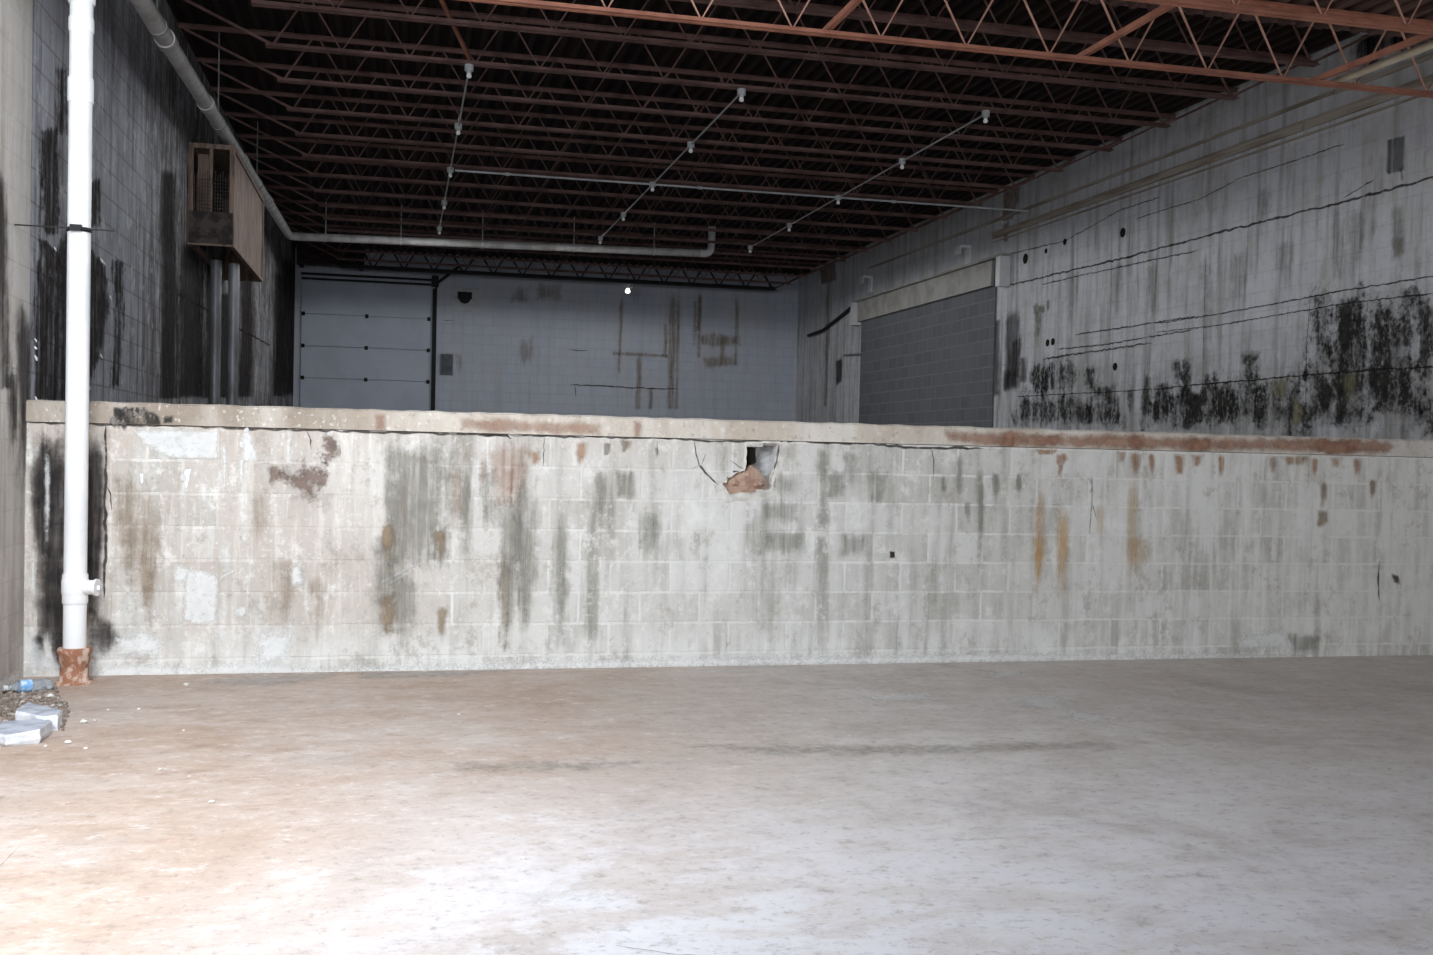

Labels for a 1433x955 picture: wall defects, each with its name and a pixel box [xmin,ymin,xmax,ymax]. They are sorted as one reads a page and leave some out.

leakage [1011,284,1433,436]
spalling [713,440,790,503]
corrosion [949,433,1391,473]
leakage [87,448,1316,684]
leakage [0,637,63,691]